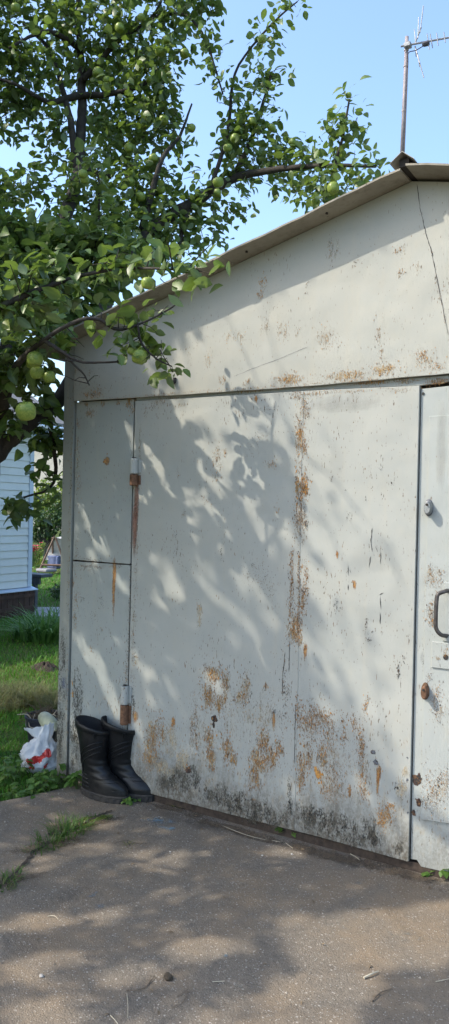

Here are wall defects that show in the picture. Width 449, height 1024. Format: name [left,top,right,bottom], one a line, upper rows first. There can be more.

rust [71,532,122,630]
rust [79,329,448,836]
water stain [157,762,382,848]